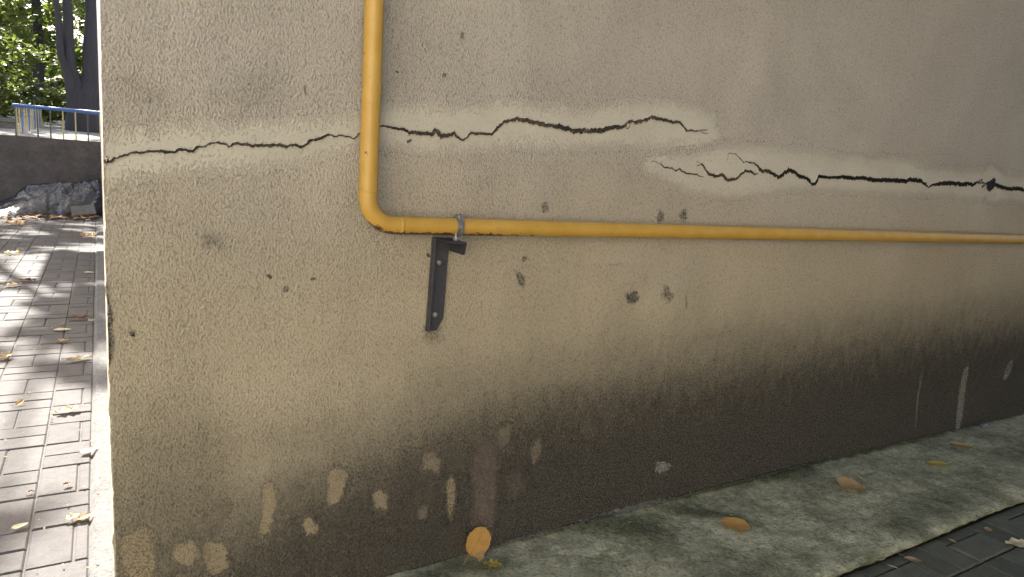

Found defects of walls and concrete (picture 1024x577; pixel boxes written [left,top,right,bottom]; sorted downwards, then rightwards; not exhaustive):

crack [103,114,708,165]
crack [651,152,1024,194]
damp [153,318,1024,577]
peeling [259,482,279,535]
peeling [326,464,349,505]
peeling [421,450,456,517]
peeling [117,523,156,577]
peeling [172,539,229,576]